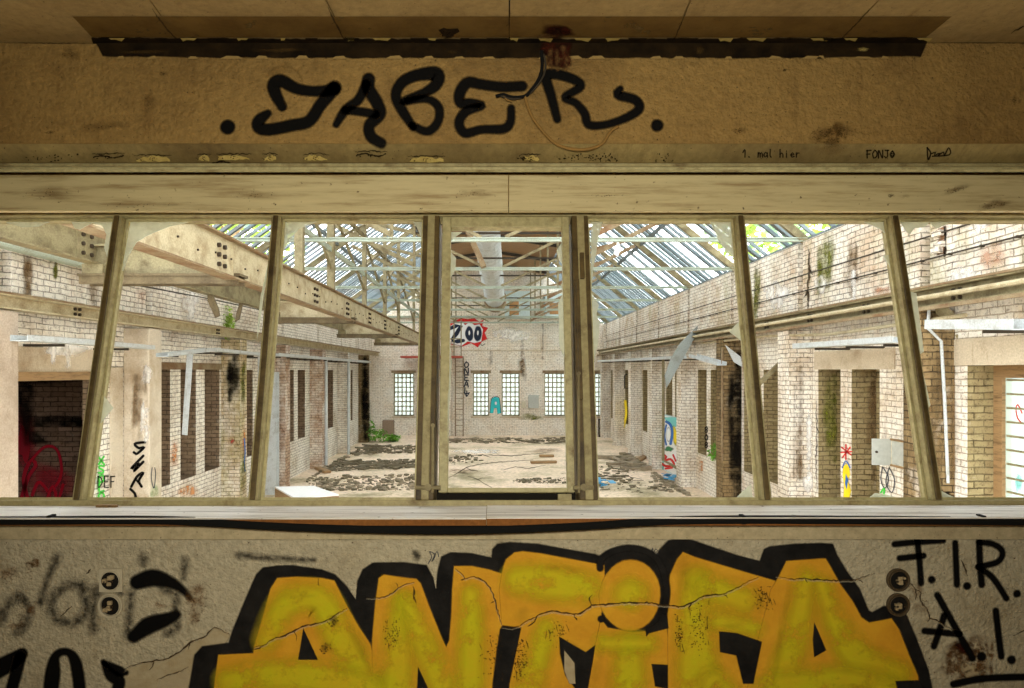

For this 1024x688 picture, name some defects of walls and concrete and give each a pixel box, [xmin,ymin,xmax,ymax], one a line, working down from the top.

corrosion [540,26,573,39]
peeling [93,152,170,162]
peeling [196,153,250,163]
leakage [730,353,742,486]
crack [456,569,875,628]
crack [253,608,347,650]
crack [125,627,229,679]